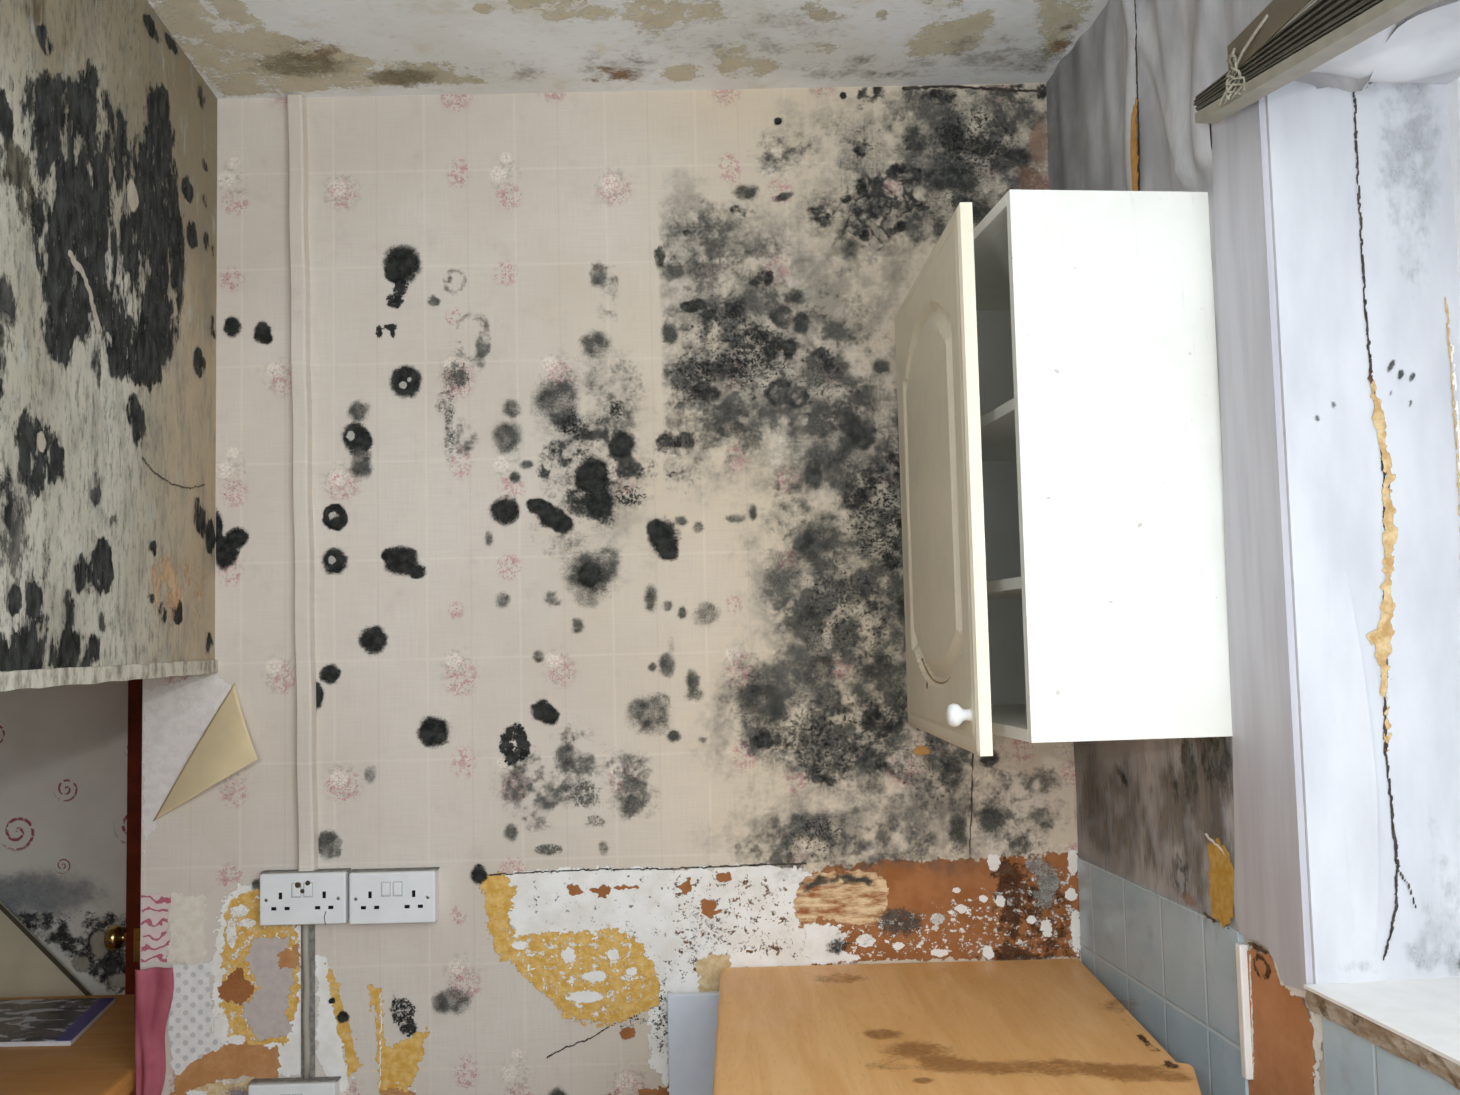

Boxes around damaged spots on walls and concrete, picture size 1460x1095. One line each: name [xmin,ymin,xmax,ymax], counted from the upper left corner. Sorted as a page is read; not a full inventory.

damp [0,0,214,447]
damp [375,245,421,338]
damp [0,404,116,671]
damp [381,545,425,579]
damp [486,186,1055,869]
crack [1353,92,1417,960]
crack [1444,297,1460,531]
peeling [153,683,257,821]
peeling [168,883,430,1095]
peeling [479,849,1081,1095]
peeling [1183,833,1234,929]
flaking render [1246,942,1323,1095]